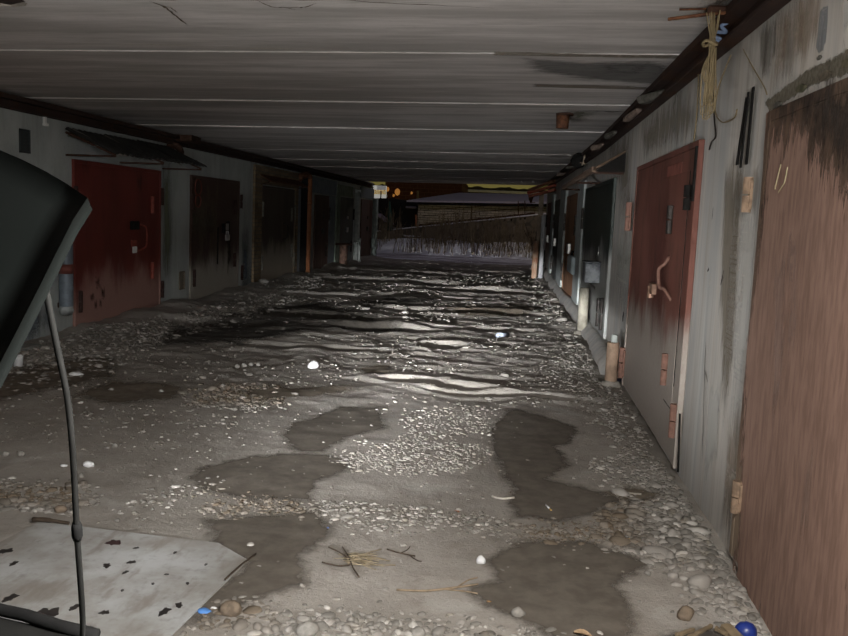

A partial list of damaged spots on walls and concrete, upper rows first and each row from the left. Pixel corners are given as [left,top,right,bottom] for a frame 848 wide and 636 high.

damp [816,6,828,53]
damp [533,60,666,83]